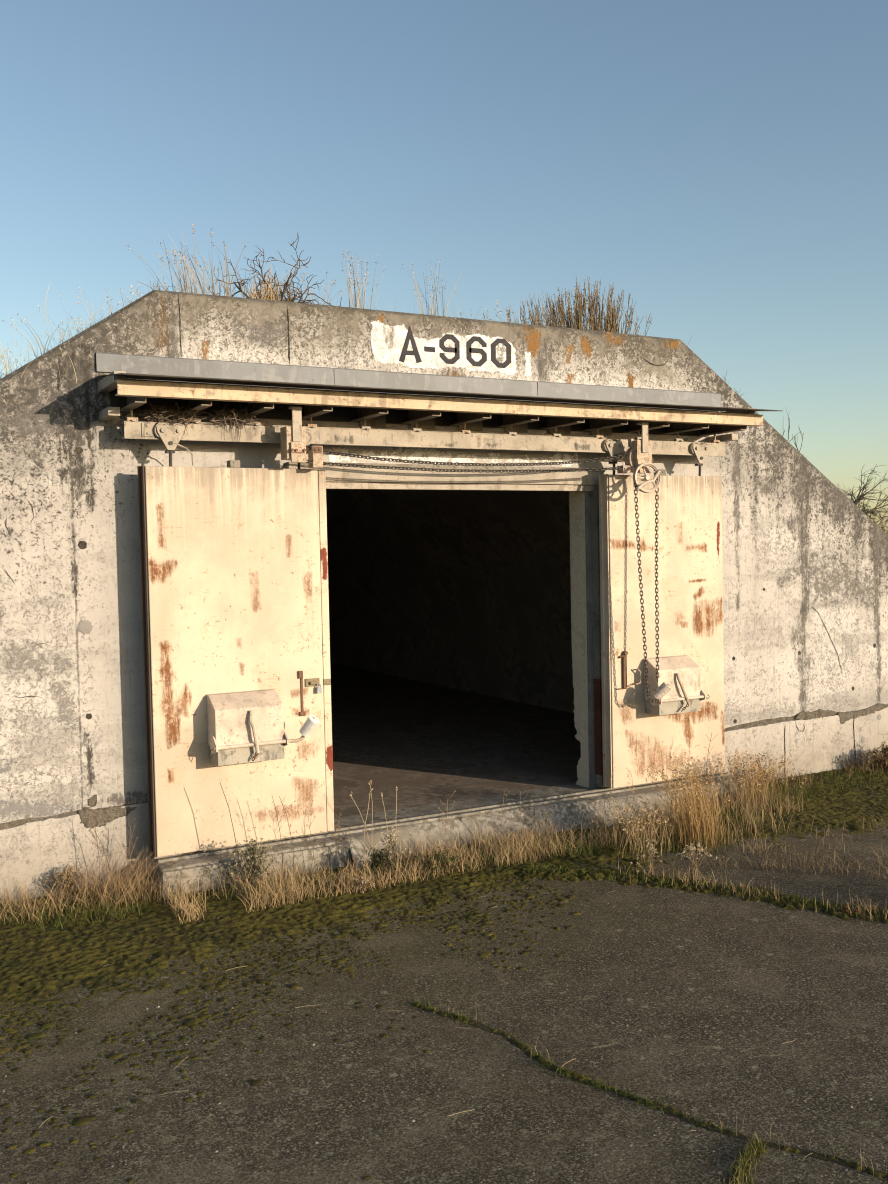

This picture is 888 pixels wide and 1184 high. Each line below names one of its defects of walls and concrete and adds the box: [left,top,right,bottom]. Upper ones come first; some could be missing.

leakage [731,435,743,570]
leakage [755,476,776,494]
rust [150,561,177,581]
rust [681,579,723,633]
leakage [778,457,882,710]
rust [161,642,191,745]
crack [724,703,888,775]
crack [0,801,148,830]
rust [259,782,313,818]